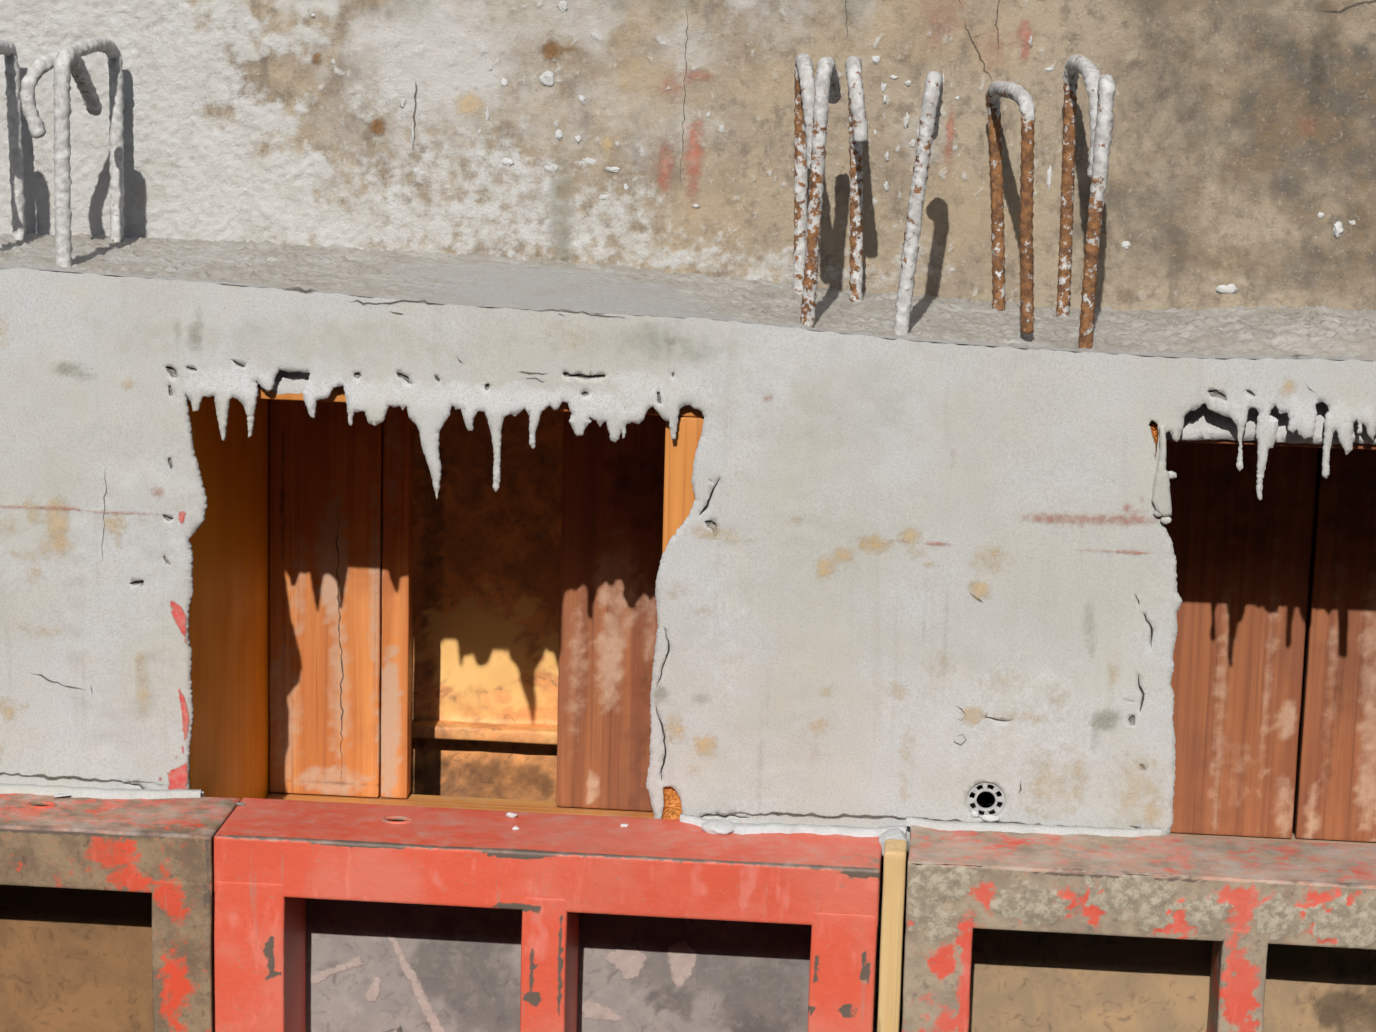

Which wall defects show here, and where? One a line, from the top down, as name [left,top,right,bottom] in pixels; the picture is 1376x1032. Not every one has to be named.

crack [959,0,1000,77]
spalling [165,366,197,396]
peeling [272,370,310,394]
spalling [563,372,605,396]
peeling [1149,390,1376,525]
peeling [171,601,186,643]
peeling [159,688,189,789]
spalling [661,786,683,820]